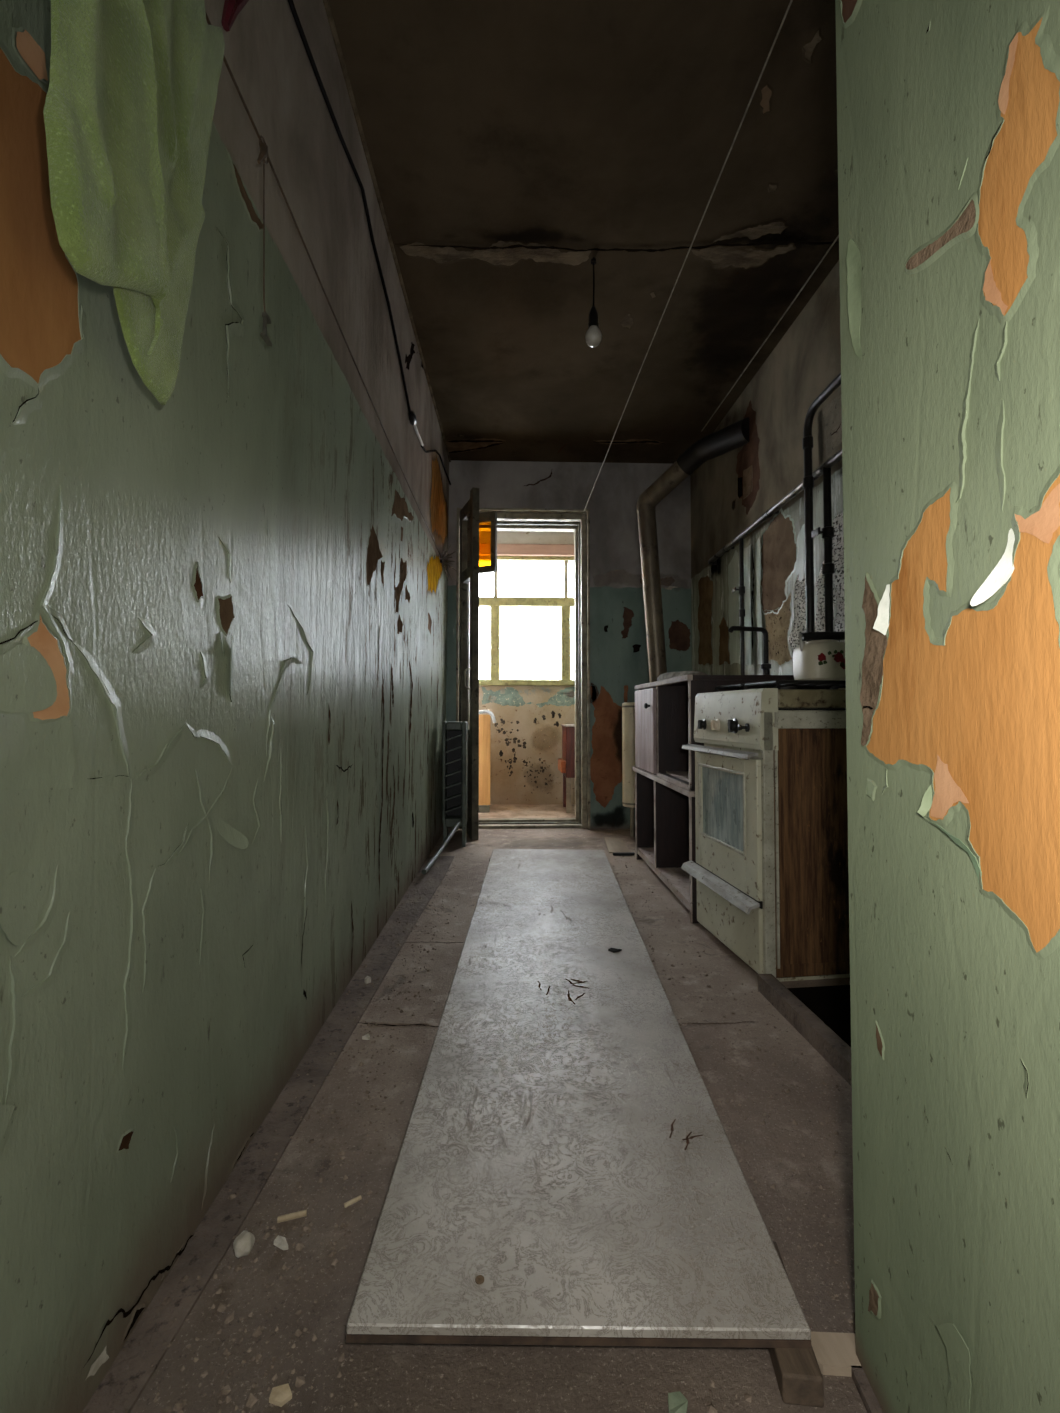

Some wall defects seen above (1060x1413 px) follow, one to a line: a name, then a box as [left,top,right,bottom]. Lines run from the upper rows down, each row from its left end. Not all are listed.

peeling [839,0,863,29]
peeling [0,26,88,393]
crack [396,218,839,270]
peeling [904,5,1060,327]
peeling [191,562,235,702]
peeling [365,488,414,636]
peeling [668,508,845,668]
peeling [482,682,629,809]
peeling [860,465,1060,960]